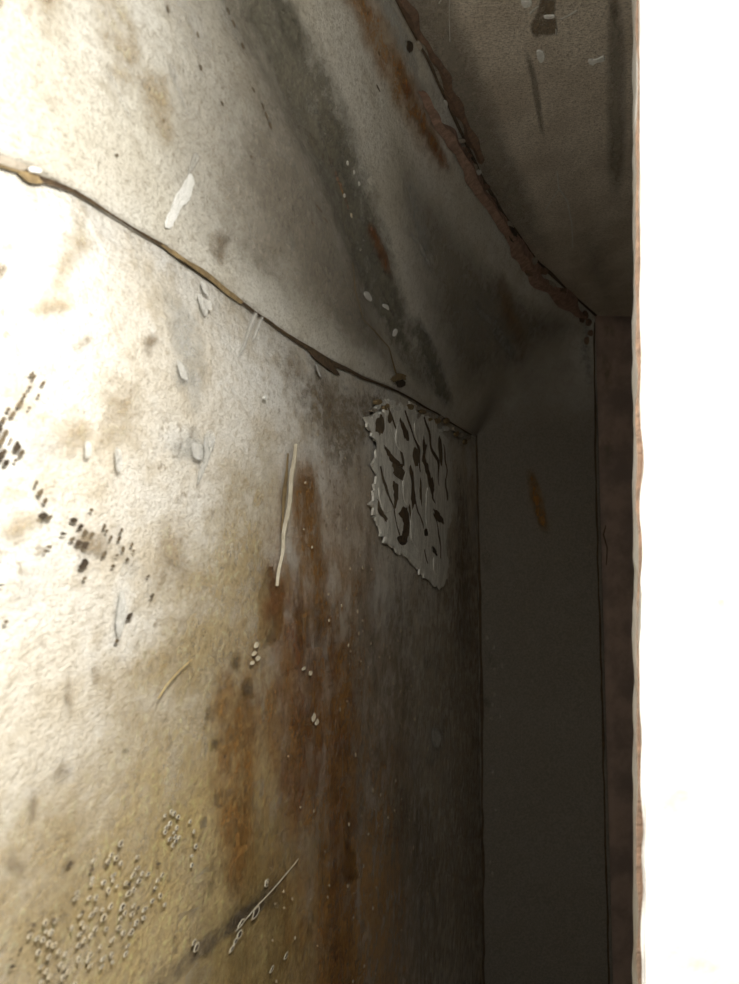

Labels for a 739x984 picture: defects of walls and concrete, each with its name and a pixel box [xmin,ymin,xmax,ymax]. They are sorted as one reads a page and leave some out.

rust [352,0,588,320]
damp [531,0,557,36]
crack [0,155,485,984]
damp [305,373,378,460]
flaking render [363,399,471,590]
crack [395,0,610,984]